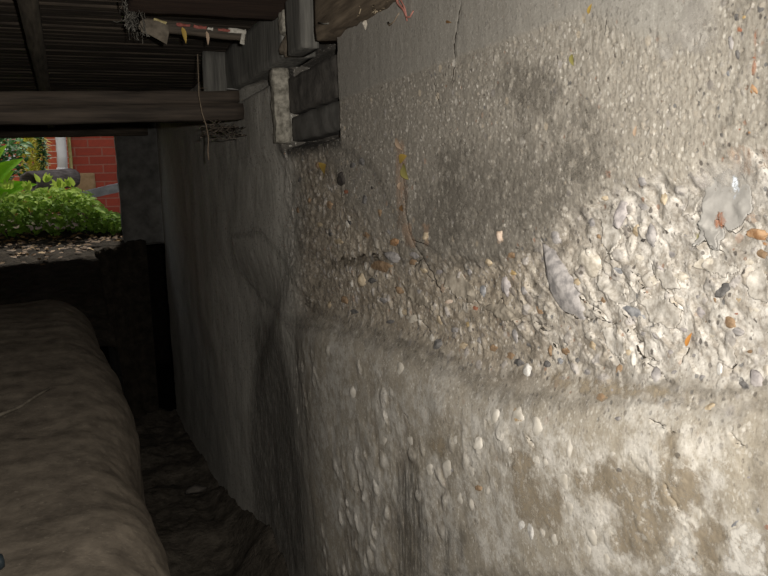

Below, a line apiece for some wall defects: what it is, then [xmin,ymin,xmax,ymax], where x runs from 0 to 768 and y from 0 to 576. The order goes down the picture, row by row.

crack [434,7,461,113]
crack [402,162,440,288]
damp [420,153,581,253]
spalling [282,141,768,410]
damp [511,451,561,531]
damp [574,436,766,576]